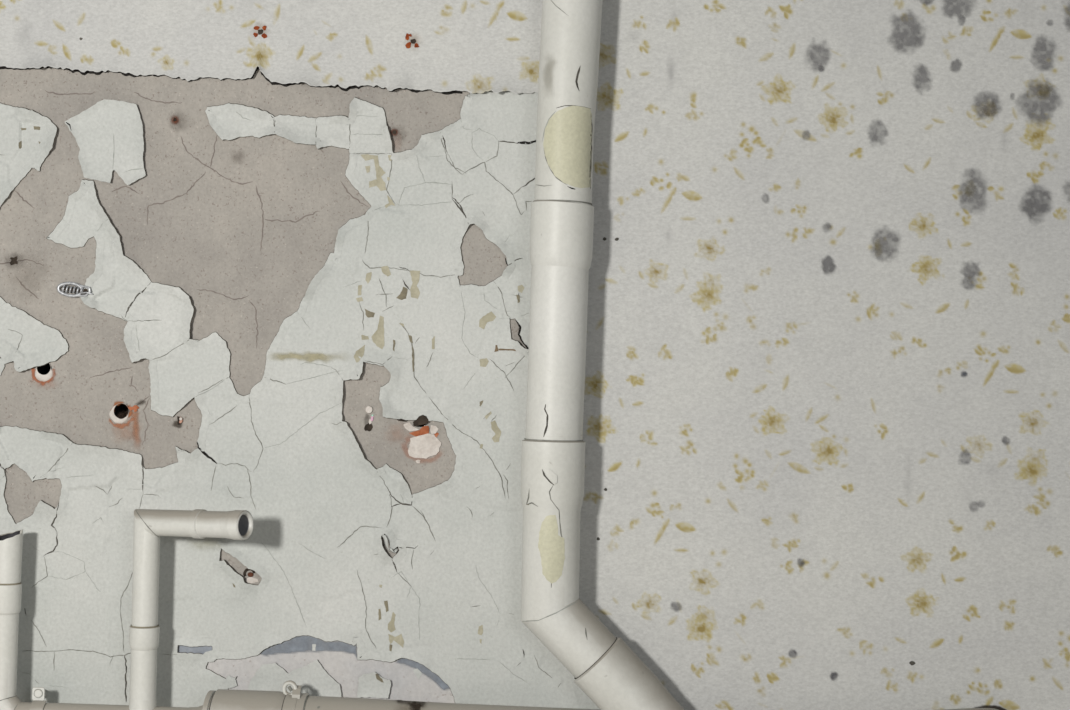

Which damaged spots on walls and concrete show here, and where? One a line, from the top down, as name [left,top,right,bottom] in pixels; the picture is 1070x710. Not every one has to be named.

leakage [893,15,922,49]
leakage [1023,85,1057,120]
peeling [0,66,472,502]
crack [345,115,536,516]
peeling [450,216,529,367]
leakage [822,256,835,273]
leakage [1023,190,1050,218]
peeling [0,456,69,531]
crack [22,503,133,701]
crack [197,362,343,509]
crack [302,472,434,647]
peeling [480,401,501,449]